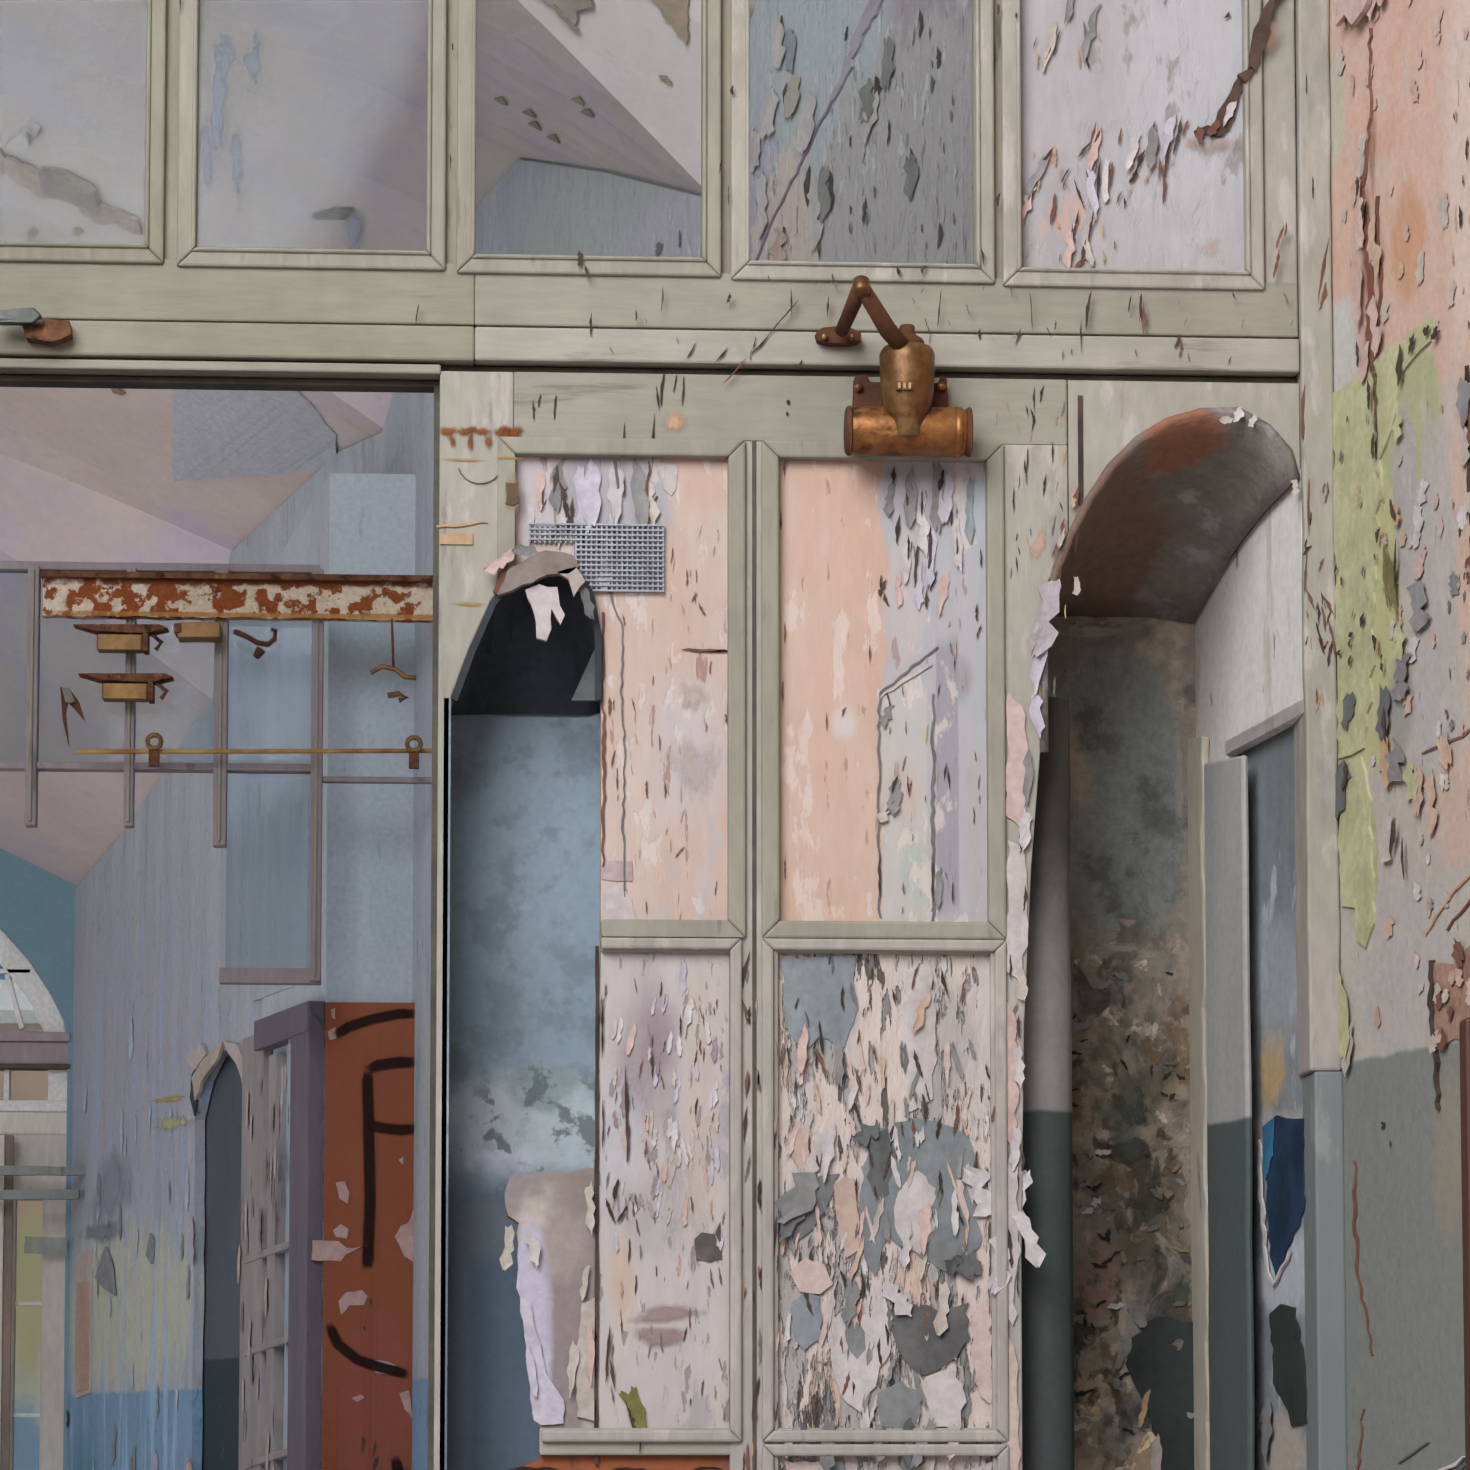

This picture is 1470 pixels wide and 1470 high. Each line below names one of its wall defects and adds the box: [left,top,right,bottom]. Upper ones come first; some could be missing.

peeling [500,1225,541,1271]
peeling [518,385,1081,1470]